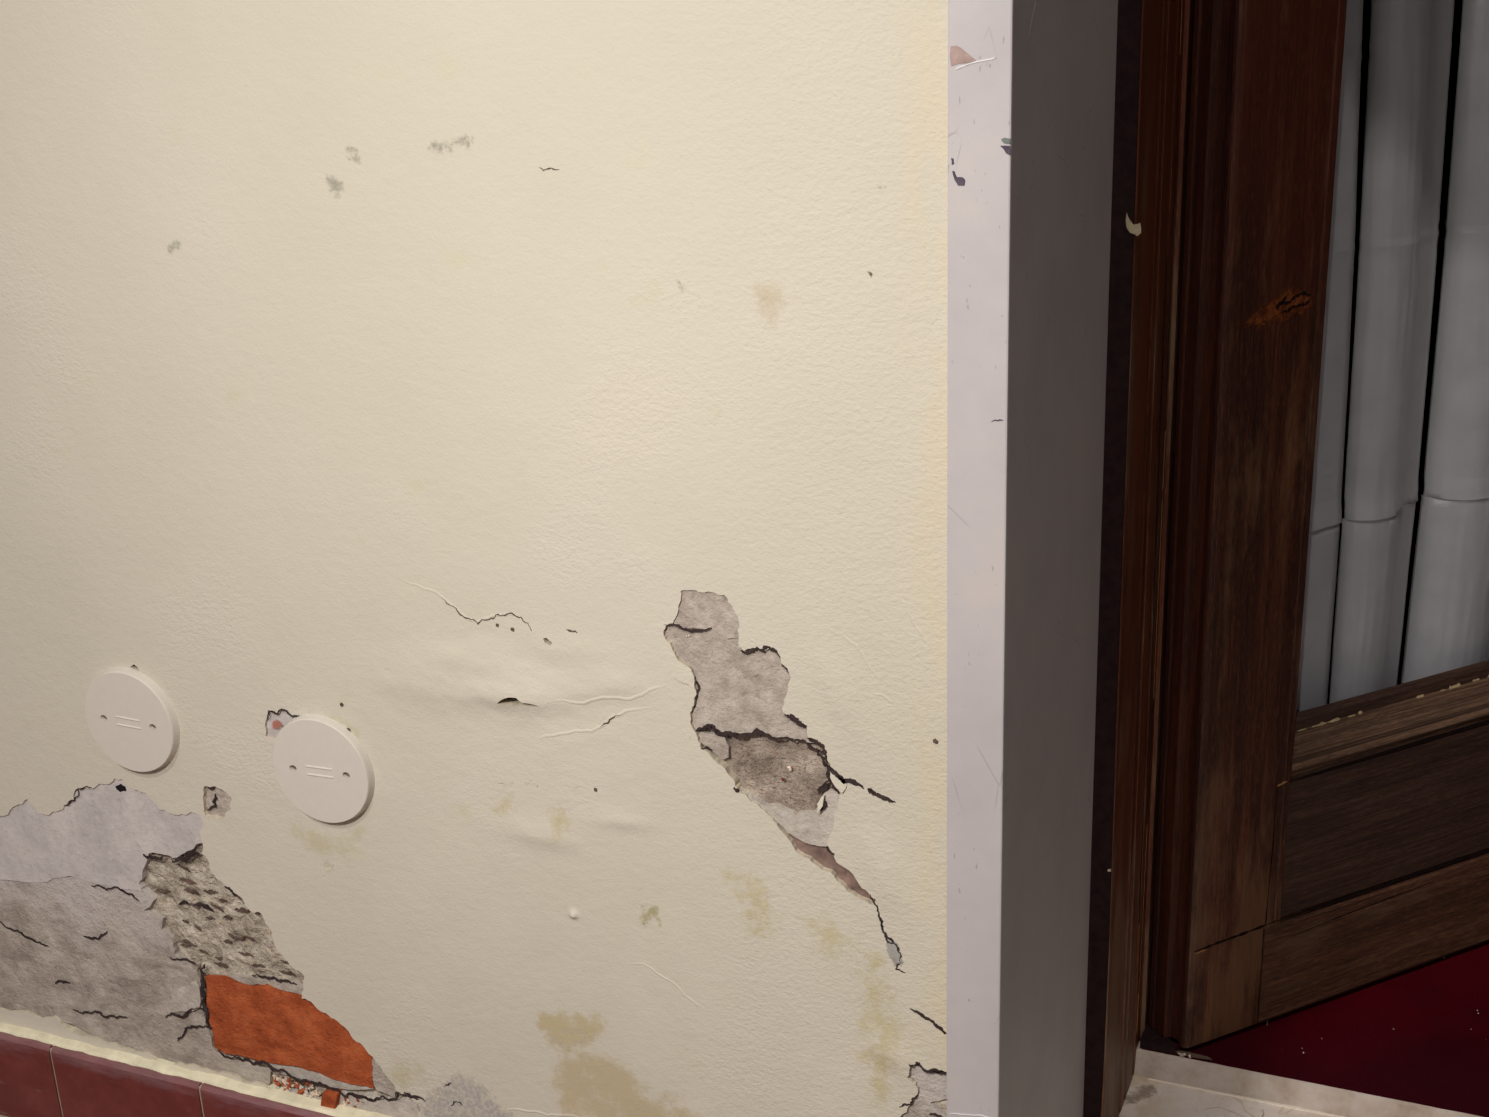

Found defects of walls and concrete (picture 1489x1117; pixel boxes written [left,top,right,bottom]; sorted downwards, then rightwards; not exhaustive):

crack [442,598,577,633]
spalling [266,709,302,739]
spalling [664,590,847,855]
spalling [0,779,511,1117]
spalling [900,1062,947,1117]